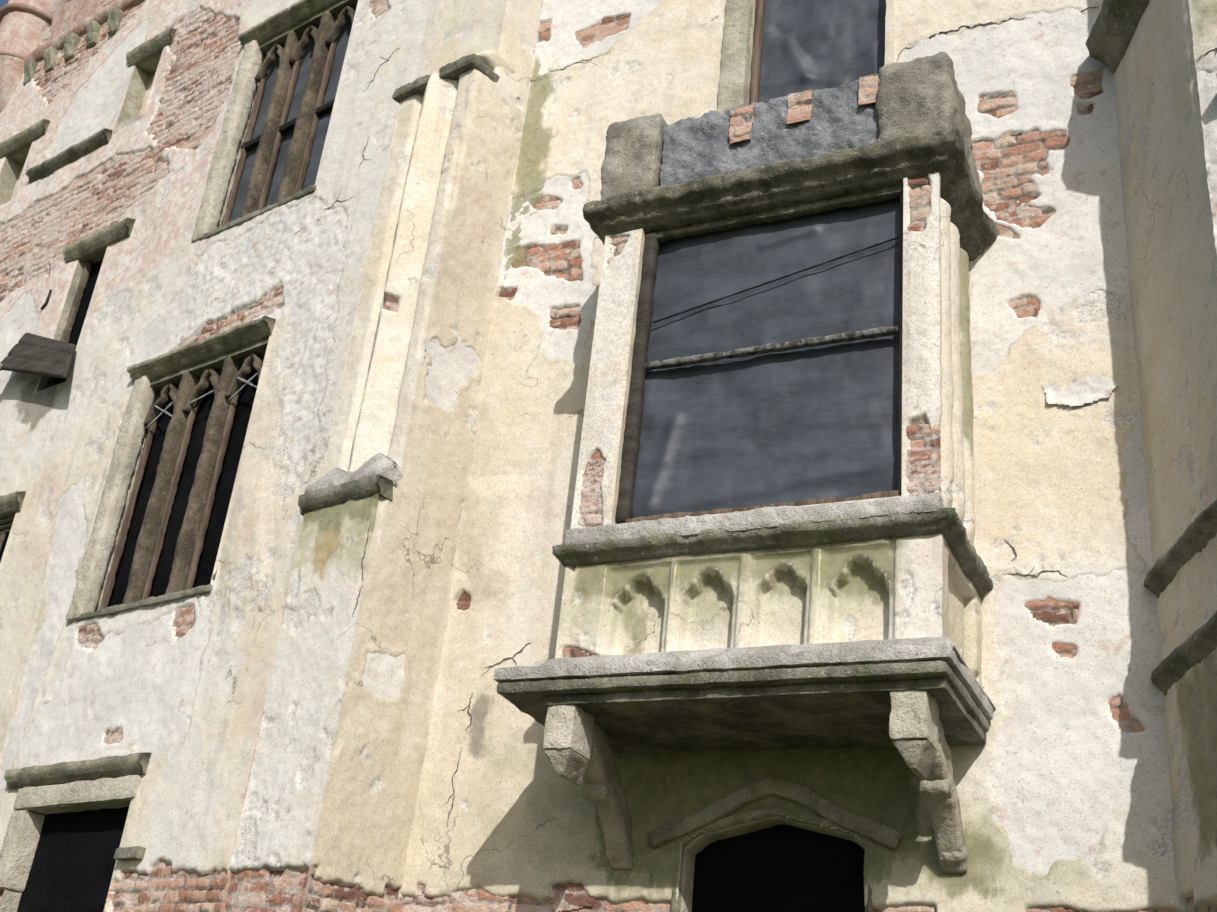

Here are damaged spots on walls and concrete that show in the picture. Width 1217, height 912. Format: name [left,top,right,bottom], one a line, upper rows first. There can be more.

peeling [533,0,663,77]
spalling [0,0,243,393]
peeling [497,172,629,368]
peeling [901,7,1130,374]
peeling [1197,71,1217,254]
crack [445,642,532,827]
spalling [577,450,605,528]
spalling [906,420,942,497]
crack [1005,540,1068,577]
peeling [987,416,1167,876]
leakage [1177,652,1217,848]